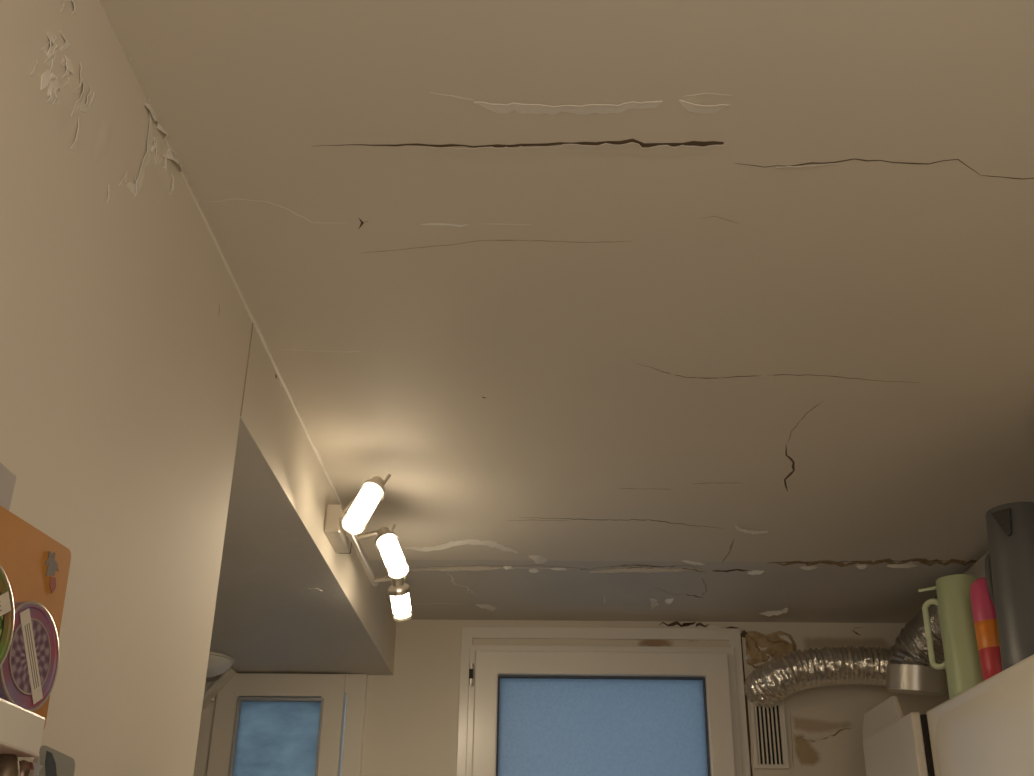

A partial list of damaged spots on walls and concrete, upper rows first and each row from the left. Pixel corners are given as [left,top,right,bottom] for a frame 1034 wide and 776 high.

peeling [430,92,663,115]
crack [320,139,1034,179]
crack [365,240,623,253]
crack [647,366,918,492]
crack [409,519,977,776]